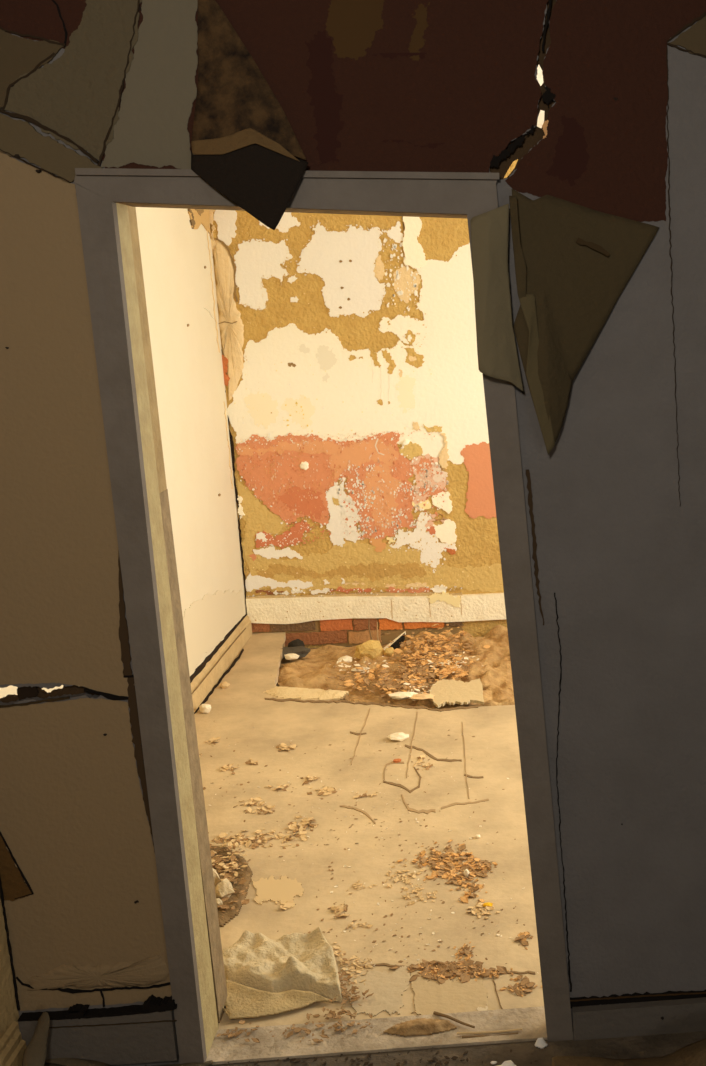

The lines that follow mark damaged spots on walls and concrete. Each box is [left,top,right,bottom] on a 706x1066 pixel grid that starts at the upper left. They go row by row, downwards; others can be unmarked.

flaking render [0,0,87,49]
flaking render [187,9,198,151]
flaking render [215,0,706,222]
flaking render [102,154,177,169]
spalling [348,330,425,377]
spalling [399,441,423,460]
flaking render [236,480,504,619]
spalling [17,686,39,700]